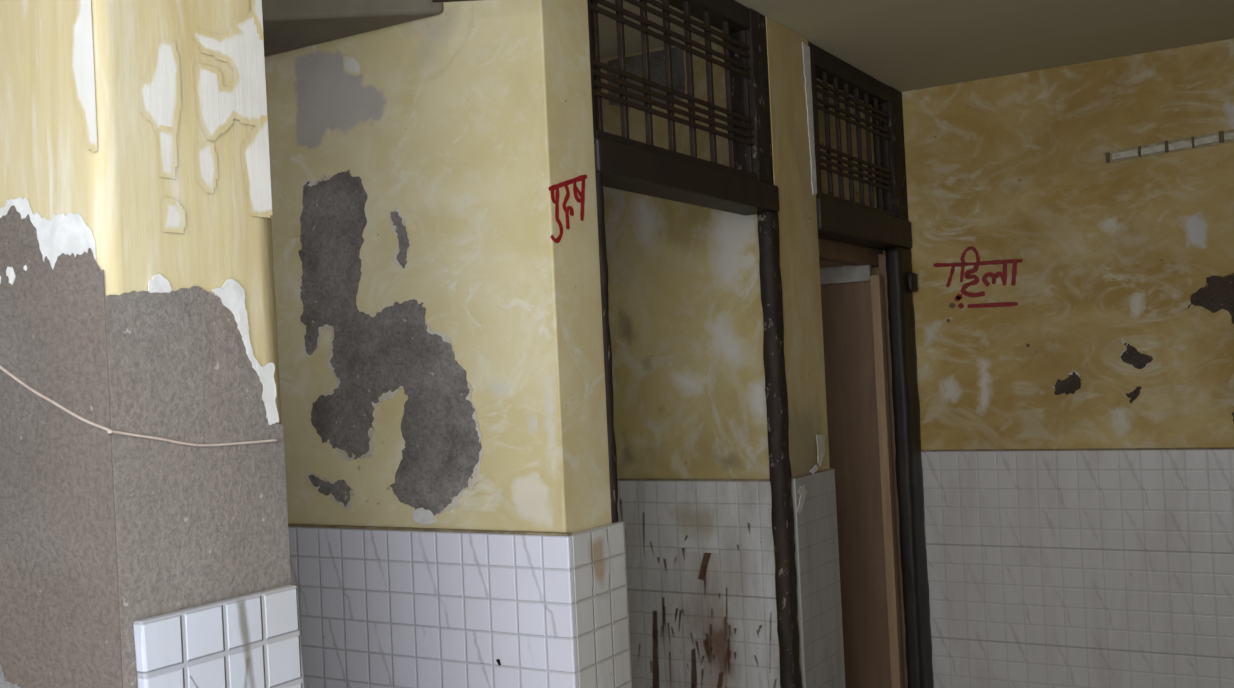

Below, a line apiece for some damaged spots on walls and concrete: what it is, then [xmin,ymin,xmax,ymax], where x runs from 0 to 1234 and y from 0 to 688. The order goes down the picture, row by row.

peeling [68,0,98,152]
peeling [138,0,272,218]
peeling [288,41,393,159]
peeling [0,197,291,688]
peeling [298,170,484,525]
peeling [1052,371,1081,395]
peeling [1173,204,1217,256]
peeling [1188,273,1234,324]
corrosion [584,529,610,599]
corrosion [618,481,780,688]